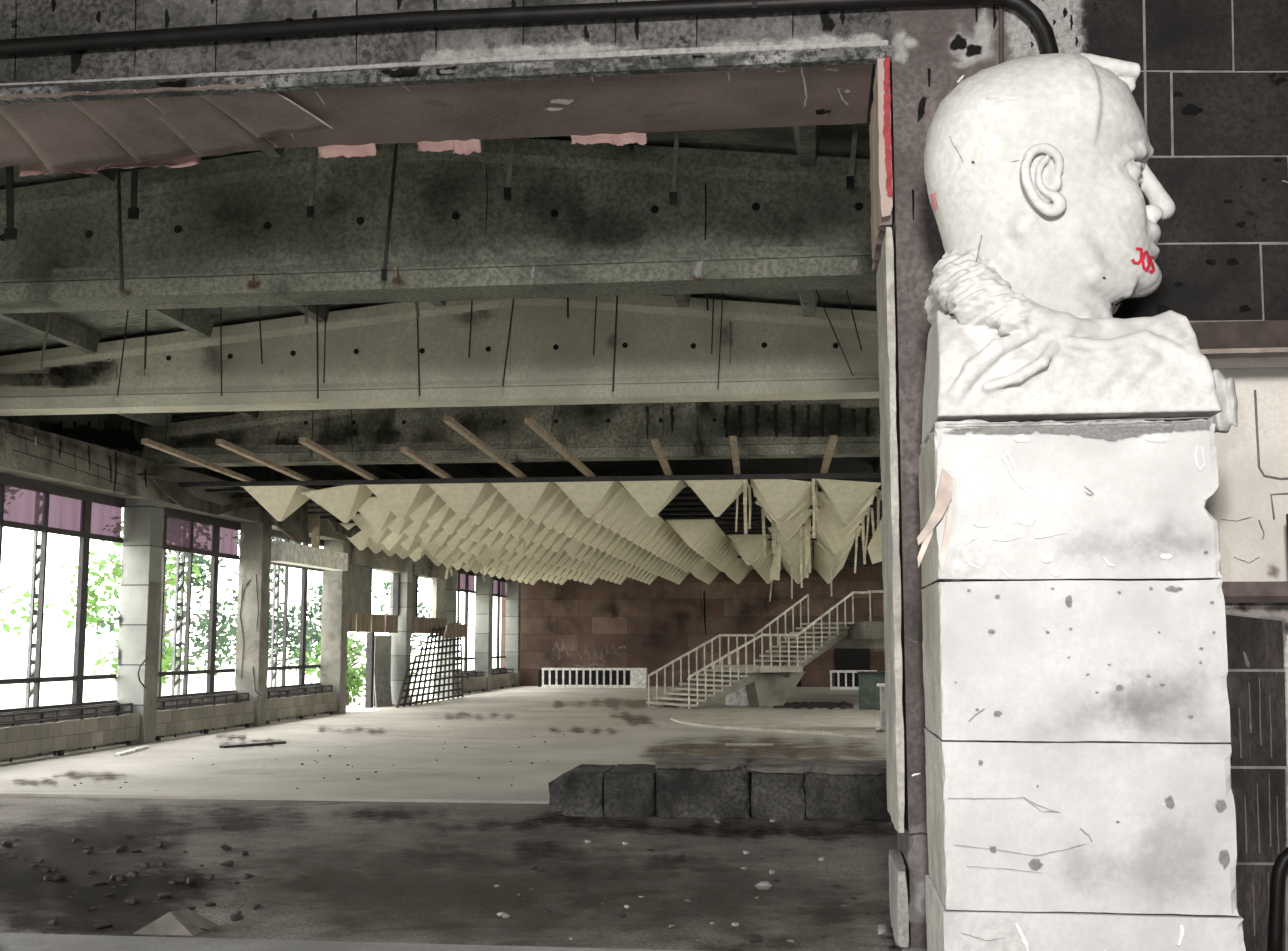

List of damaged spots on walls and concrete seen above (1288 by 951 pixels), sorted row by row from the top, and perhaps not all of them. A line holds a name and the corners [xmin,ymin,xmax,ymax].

flaking render [894,32,917,62]
flaking render [954,7,1041,67]
flaking render [1030,0,1084,54]
spalling [1173,92,1203,116]
crack [947,797,1093,873]